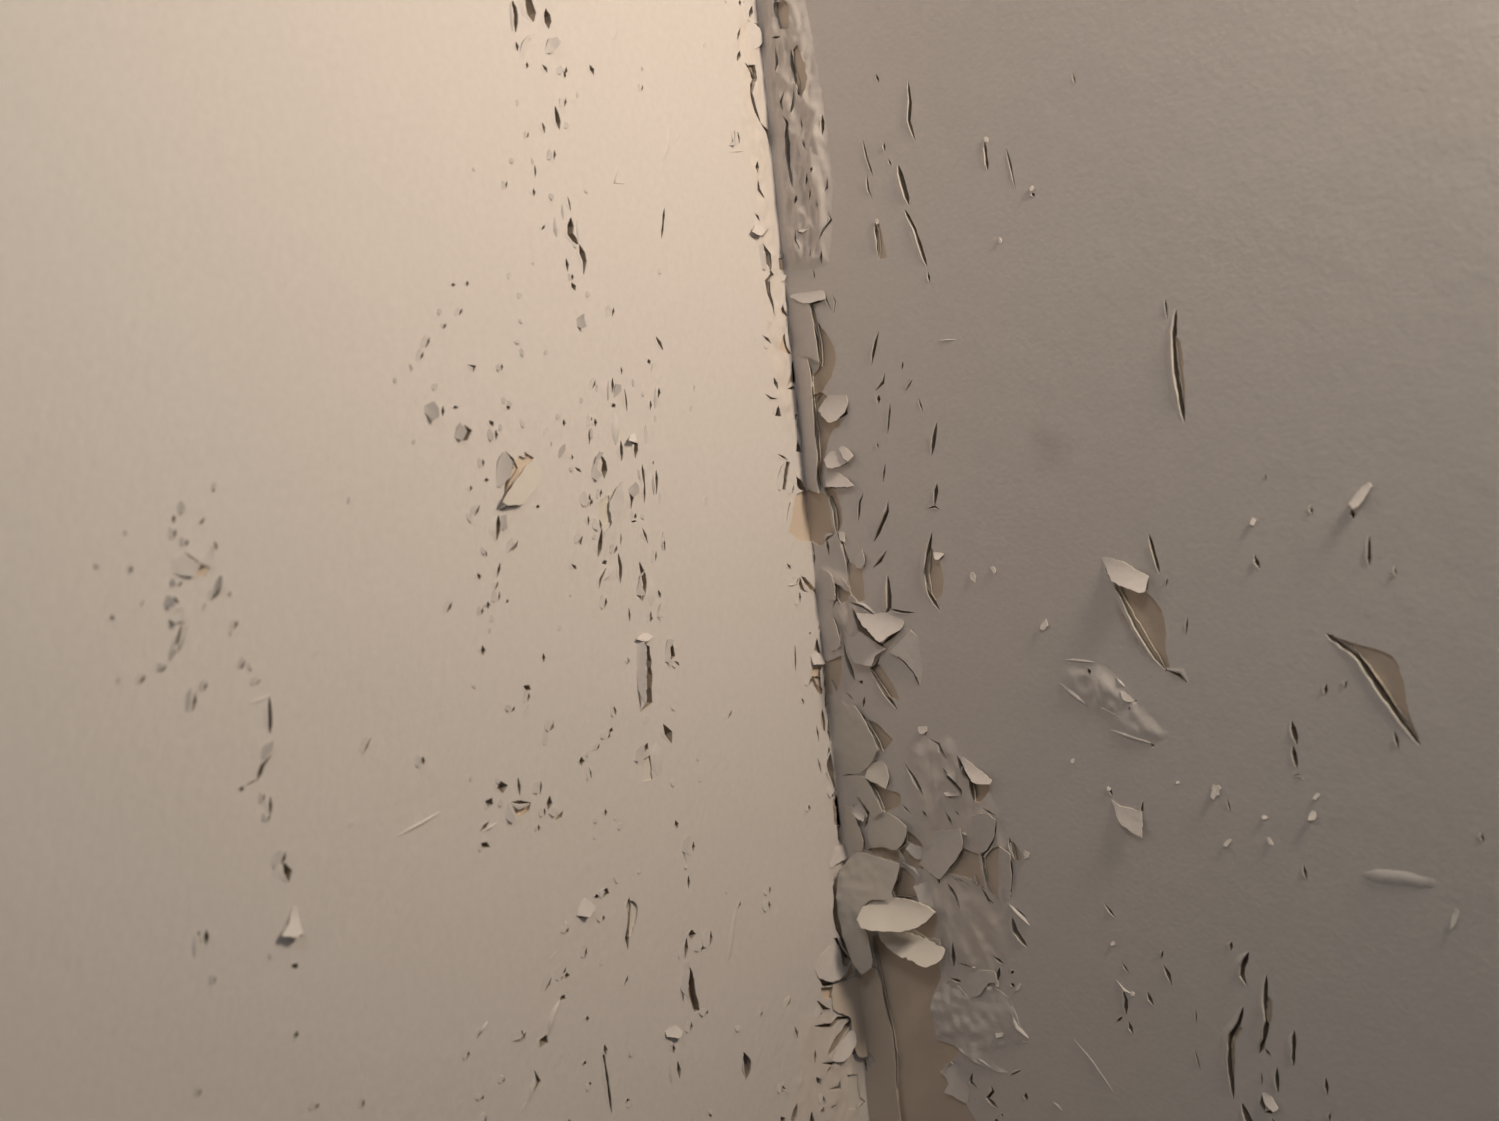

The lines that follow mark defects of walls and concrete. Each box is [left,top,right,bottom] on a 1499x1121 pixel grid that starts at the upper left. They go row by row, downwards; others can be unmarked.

peeling [508,0,568,79]
peeling [509,92,590,328]
peeling [157,501,232,671]
peeling [424,383,541,655]
peeling [543,356,665,622]
peeling [724,0,1030,1121]
peeling [1101,557,1189,683]
peeling [634,701,675,786]
peeling [1325,634,1420,746]
peeling [476,778,563,852]
peeling [1106,787,1144,838]
peeling [1238,1092,1278,1121]